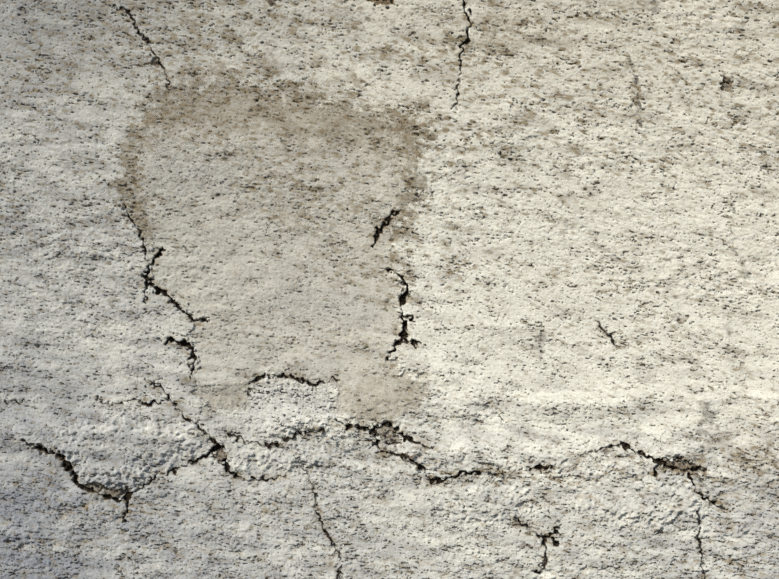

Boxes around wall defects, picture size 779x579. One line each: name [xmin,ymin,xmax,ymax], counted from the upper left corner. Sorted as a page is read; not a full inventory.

crack [112,4,171,90]
crack [453,0,471,109]
crack [123,205,208,322]
crack [371,210,400,248]
crack [164,337,197,374]
crack [247,373,337,396]
crack [386,269,421,361]
crack [5,378,481,579]
crack [518,519,560,574]
crack [588,442,722,574]